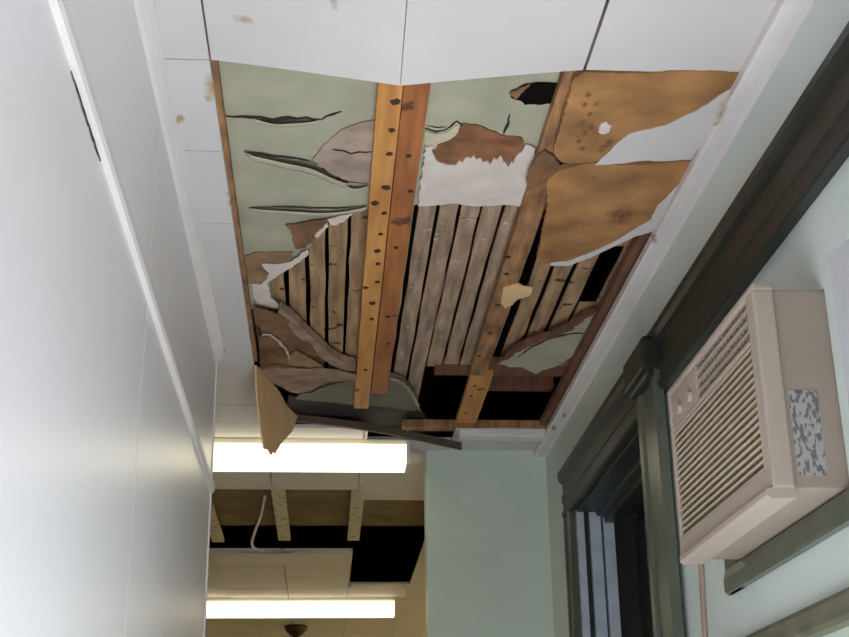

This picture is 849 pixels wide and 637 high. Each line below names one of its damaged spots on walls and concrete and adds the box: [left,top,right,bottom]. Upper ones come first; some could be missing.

crack [71,71,101,162]
crack [226,111,342,127]
spalling [509,83,557,105]
crack [244,151,369,217]
peeling [313,120,375,184]
crack [332,148,372,156]
peeling [418,123,560,206]
spalling [245,214,357,395]
peeling [501,283,532,308]
spalling [496,308,598,364]